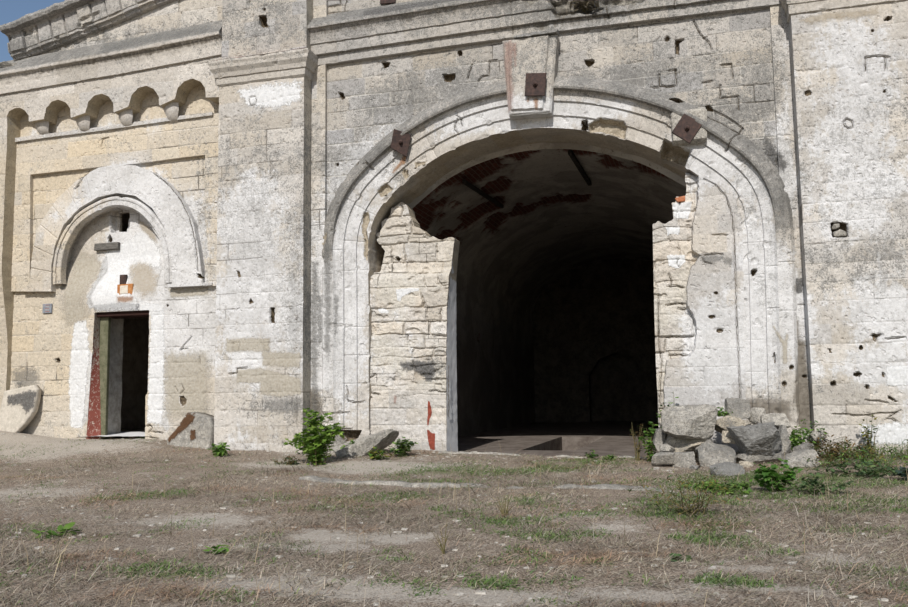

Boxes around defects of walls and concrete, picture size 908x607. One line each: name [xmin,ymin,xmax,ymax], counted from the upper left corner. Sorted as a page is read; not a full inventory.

spalling [510,0,643,18]
leakage [400,360,435,381]